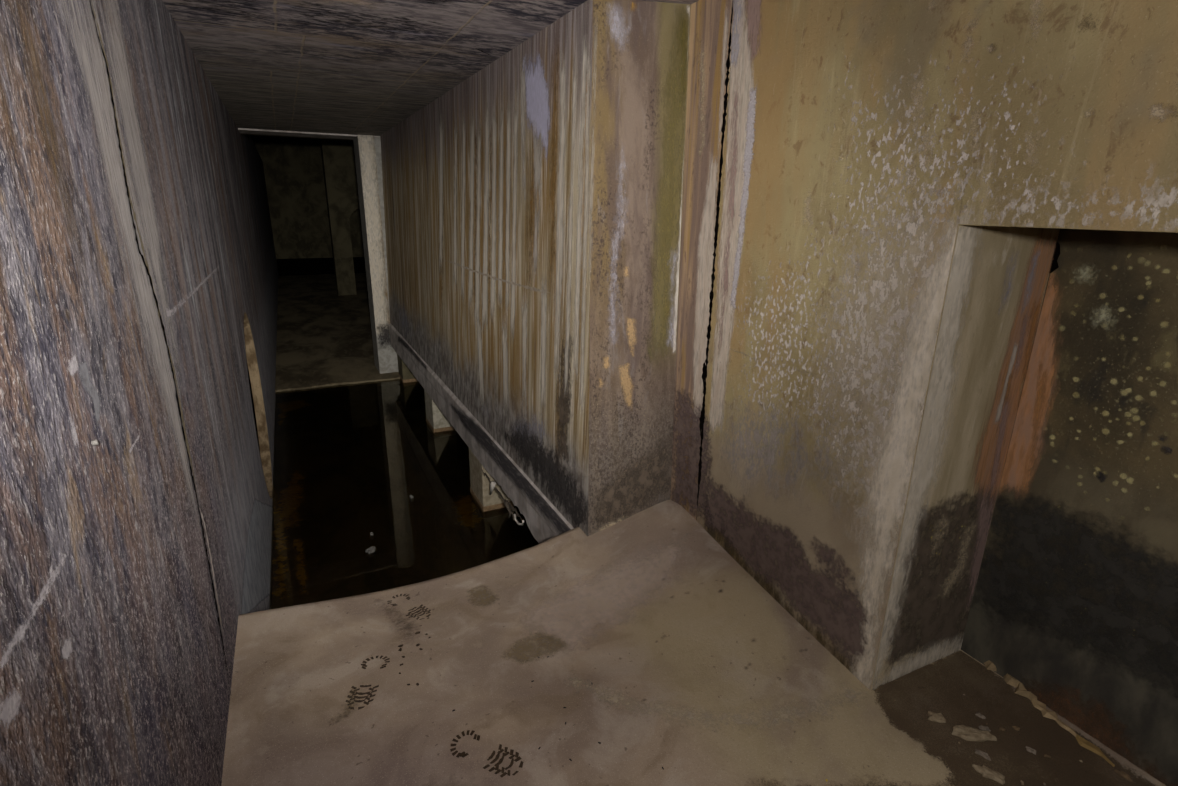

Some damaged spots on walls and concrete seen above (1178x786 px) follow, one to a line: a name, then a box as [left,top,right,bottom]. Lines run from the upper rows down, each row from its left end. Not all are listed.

water stain [358,135,427,369]
crack [696,3,733,520]
water stain [439,0,1178,786]
rust [967,235,1057,605]